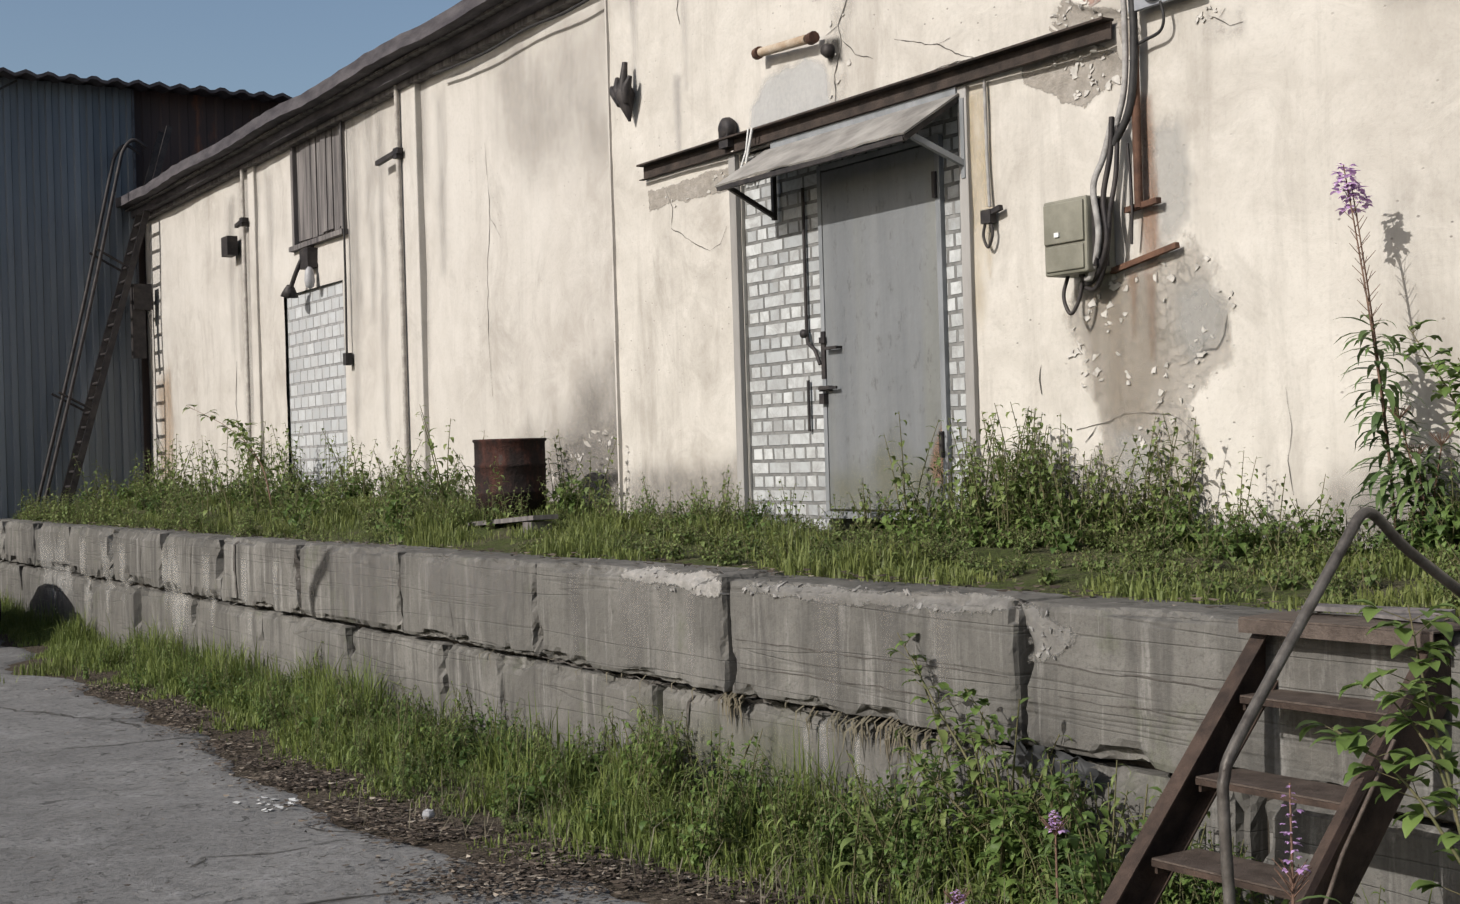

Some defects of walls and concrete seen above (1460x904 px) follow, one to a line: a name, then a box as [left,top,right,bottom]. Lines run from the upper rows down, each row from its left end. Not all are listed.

crack [815,0,970,102]
peeling [1022,0,1141,108]
spalling [648,161,779,211]
peeling [1067,263,1175,387]
peeling [1138,362,1195,448]
spalling [621,566,1076,663]
crack [504,616,1010,760]
crack [1039,662,1221,720]